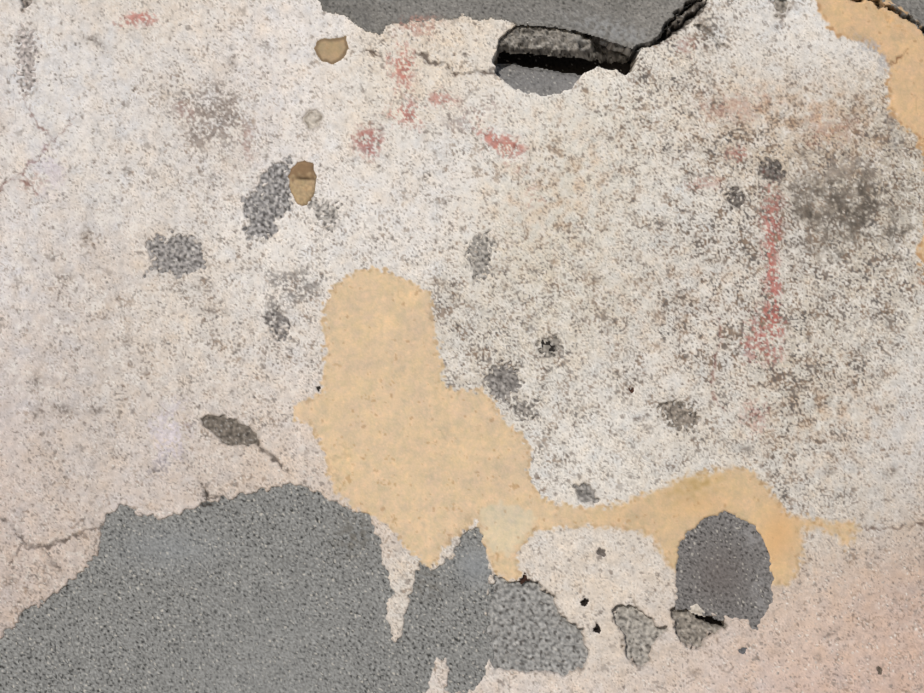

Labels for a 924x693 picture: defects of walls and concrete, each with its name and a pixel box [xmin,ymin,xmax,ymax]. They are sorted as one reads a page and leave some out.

spalling [495,25,631,96]
crack [628,0,732,63]
crack [850,0,924,63]
crack [22,93,77,140]
crack [0,176,21,194]
crack [83,204,91,241]
spalling [202,415,258,447]
spalling [482,359,542,421]
spalling [657,396,706,435]
crack [0,516,105,571]
spalling [478,575,588,676]
spalling [613,604,726,666]